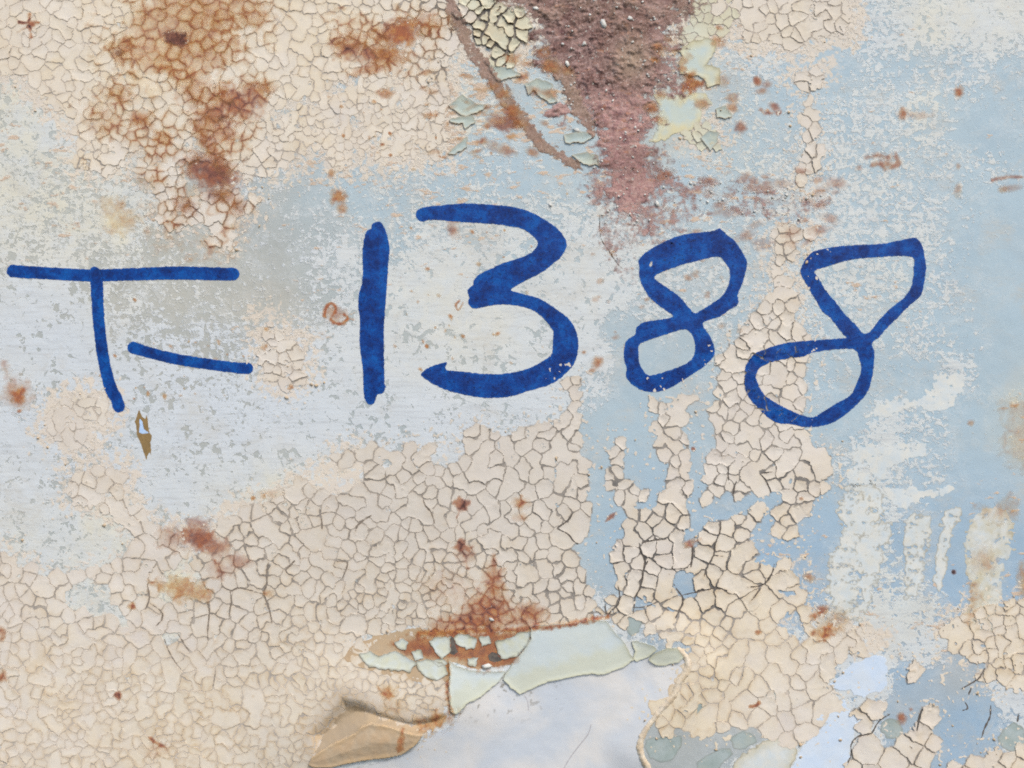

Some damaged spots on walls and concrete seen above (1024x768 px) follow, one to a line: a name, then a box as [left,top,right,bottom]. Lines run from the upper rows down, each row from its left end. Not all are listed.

corrosion [108,0,267,208]
peeling [0,0,539,252]
corrosion [332,0,711,272]
crack [145,560,295,669]
corrosion [393,559,610,727]
peeling [0,221,1024,768]
crack [557,513,578,545]
crack [604,521,775,618]
crack [962,668,991,738]